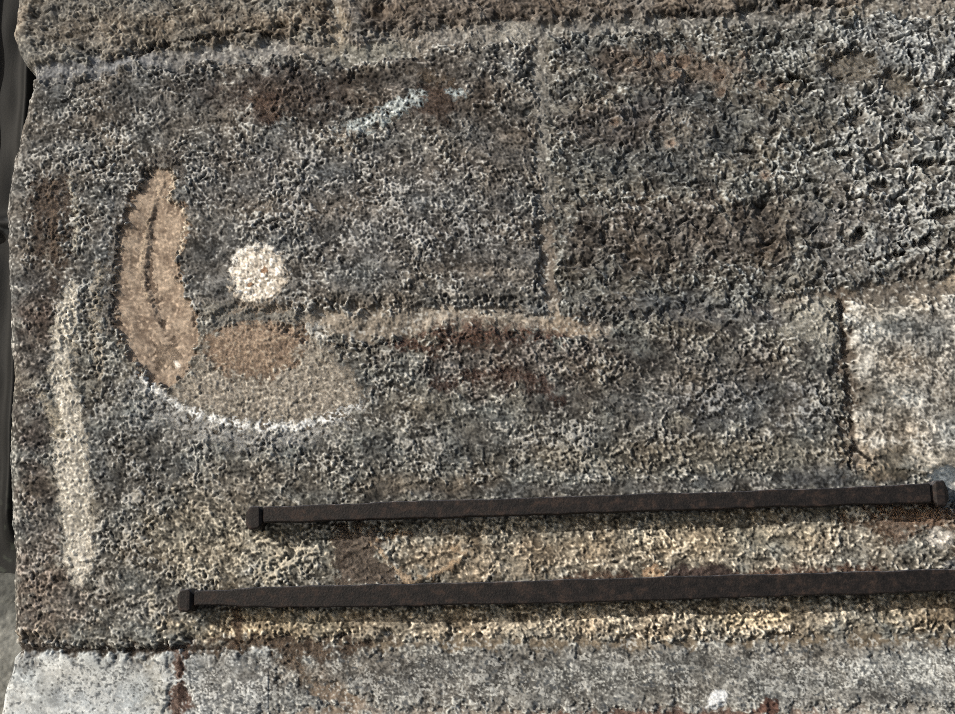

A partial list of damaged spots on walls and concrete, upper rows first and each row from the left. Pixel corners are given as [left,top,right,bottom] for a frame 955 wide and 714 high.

rust [172,646,189,714]
rust [614,698,779,714]